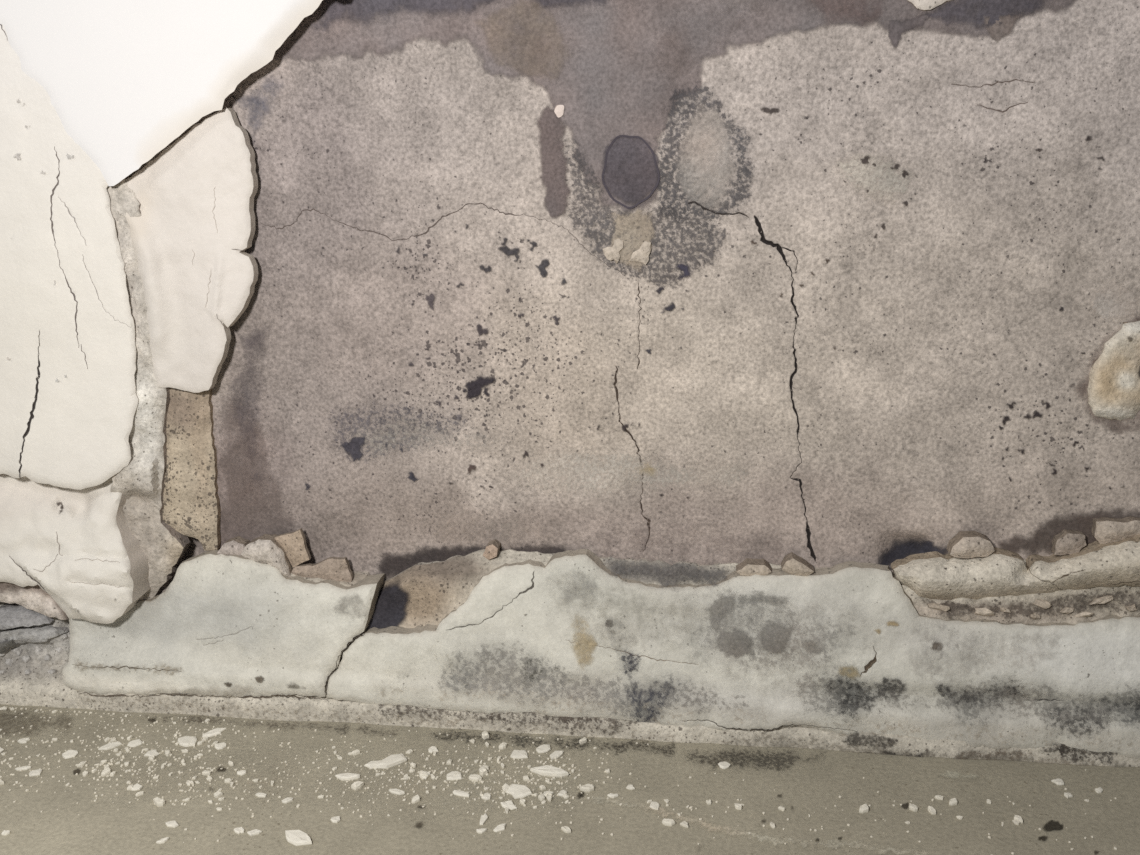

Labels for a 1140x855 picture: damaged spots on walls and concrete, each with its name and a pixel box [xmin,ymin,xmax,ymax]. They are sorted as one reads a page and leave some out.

crack [19,331,40,477]
crack [50,146,131,369]
peeling [0,0,323,601]
crack [261,203,651,552]
water stain [276,0,1075,293]
crack [688,201,816,561]
spalling [1079,319,1140,431]
crack [449,572,534,630]
peeling [0,534,1140,759]
water stain [705,594,909,716]
water stain [937,682,1140,763]